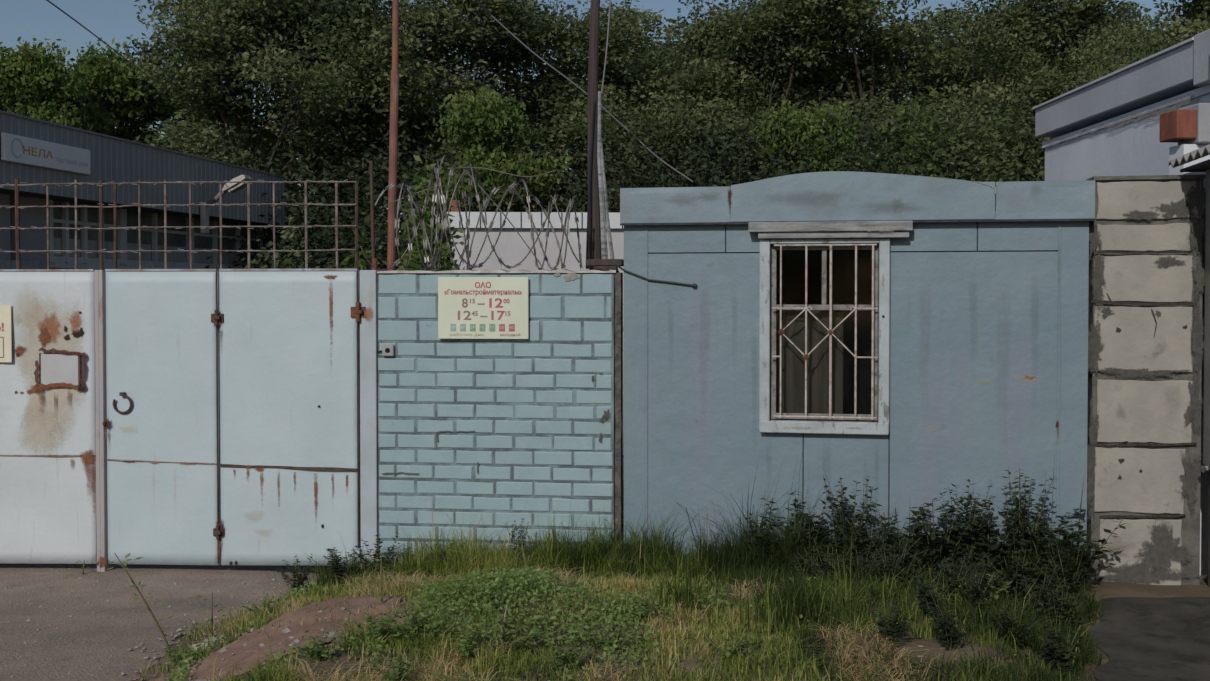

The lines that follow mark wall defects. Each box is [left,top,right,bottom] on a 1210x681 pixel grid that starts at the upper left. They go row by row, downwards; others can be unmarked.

corrosion [325,275,337,328]
corrosion [14,313,87,411]
corrosion [70,450,96,508]
corrosion [314,475,348,514]